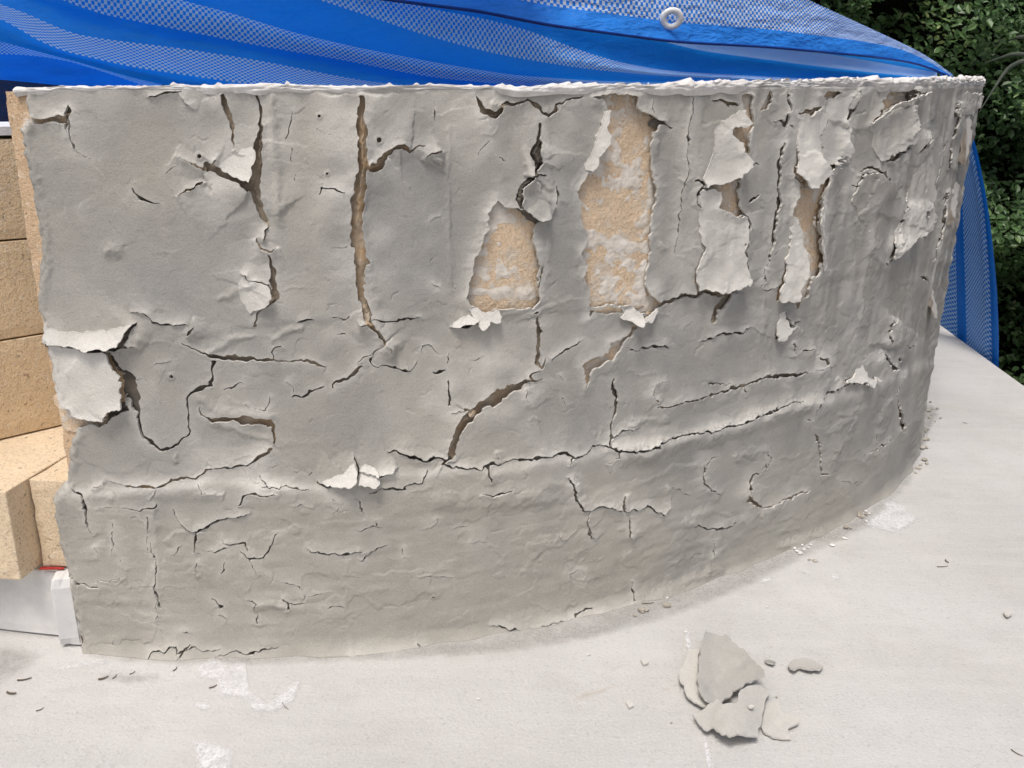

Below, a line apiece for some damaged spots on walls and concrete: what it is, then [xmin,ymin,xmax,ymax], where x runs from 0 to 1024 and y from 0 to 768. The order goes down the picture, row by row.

flaking render [218,147,256,182]
spalling [451,176,557,331]
spalling [578,93,662,384]
flaking render [696,92,771,295]
flaking render [776,90,857,342]
crack [852,103,960,188]
crack [907,90,917,108]
crack [923,193,948,248]
flaking render [42,324,133,432]
crack [45,94,829,618]
crack [885,322,911,370]
crack [148,645,272,659]